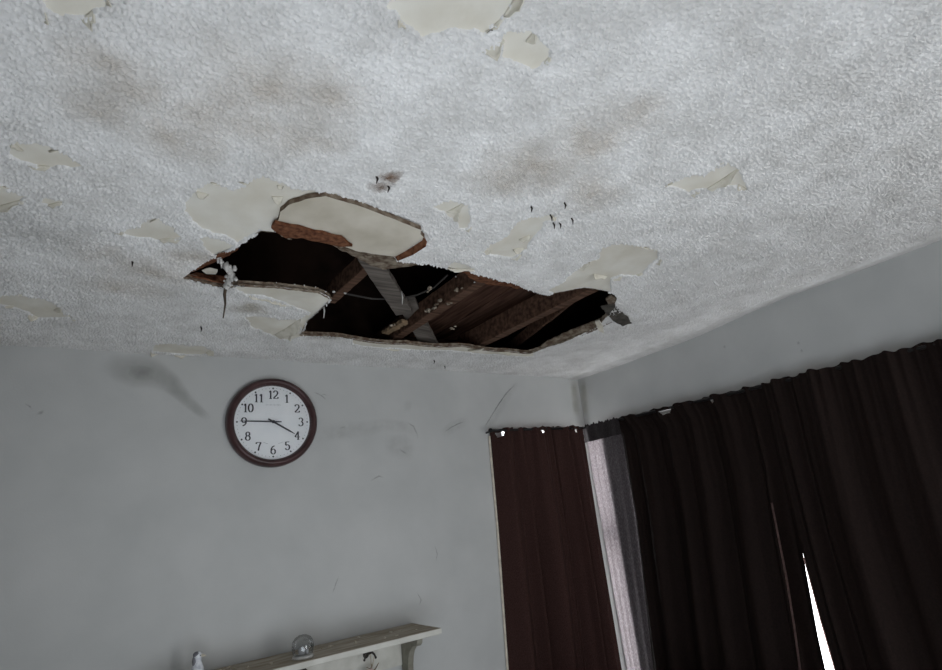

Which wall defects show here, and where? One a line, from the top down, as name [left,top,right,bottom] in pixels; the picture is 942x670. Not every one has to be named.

peeling [387,0,551,69]
peeling [9,142,81,172]
peeling [665,162,747,198]
peeling [185,176,316,254]
peeling [434,200,472,232]
peeling [448,262,475,273]
peeling [549,244,662,293]
peeling [236,287,329,329]
peeling [349,338,535,367]